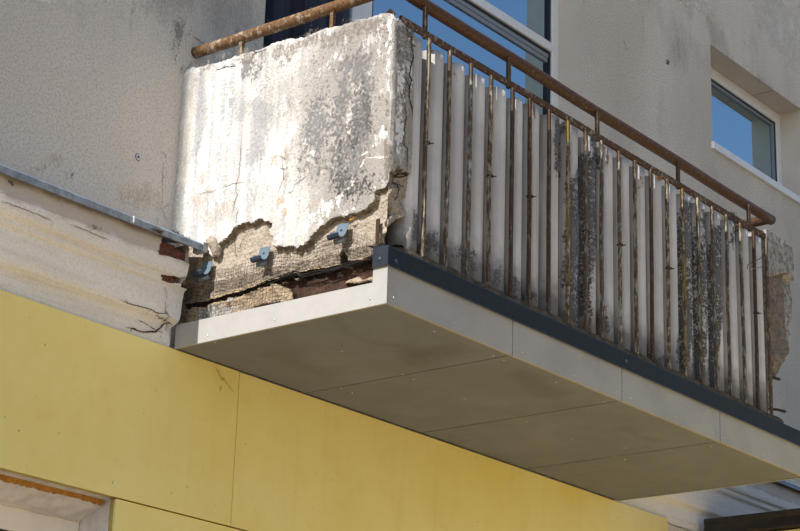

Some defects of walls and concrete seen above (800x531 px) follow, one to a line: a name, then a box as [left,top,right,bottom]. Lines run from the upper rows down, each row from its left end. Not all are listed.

spalling [158,19,411,320]
water stain [238,18,415,203]
crack [123,288,172,333]
spalling [765,273,789,407]